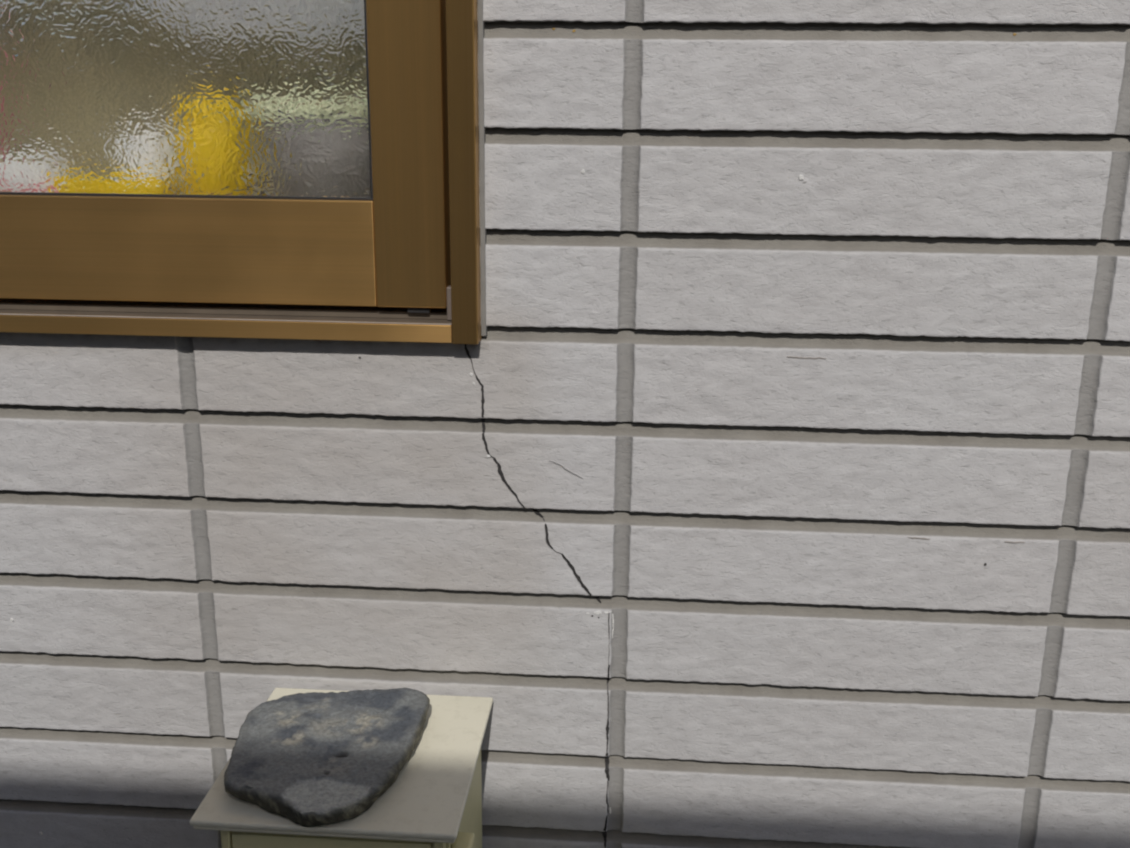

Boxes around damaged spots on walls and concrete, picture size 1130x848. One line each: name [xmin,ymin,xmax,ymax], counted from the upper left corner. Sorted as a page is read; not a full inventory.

crack [465,344,614,848]